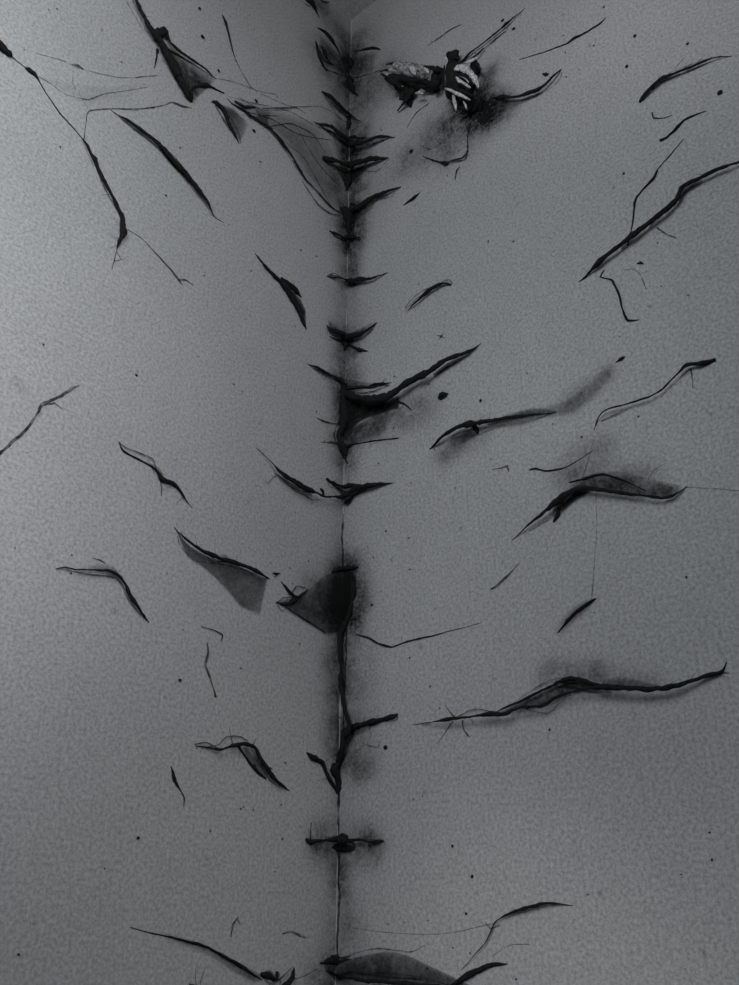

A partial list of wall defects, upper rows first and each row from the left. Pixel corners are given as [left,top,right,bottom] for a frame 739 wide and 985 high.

crack [0,387,76,455]
crack [334,767,342,952]